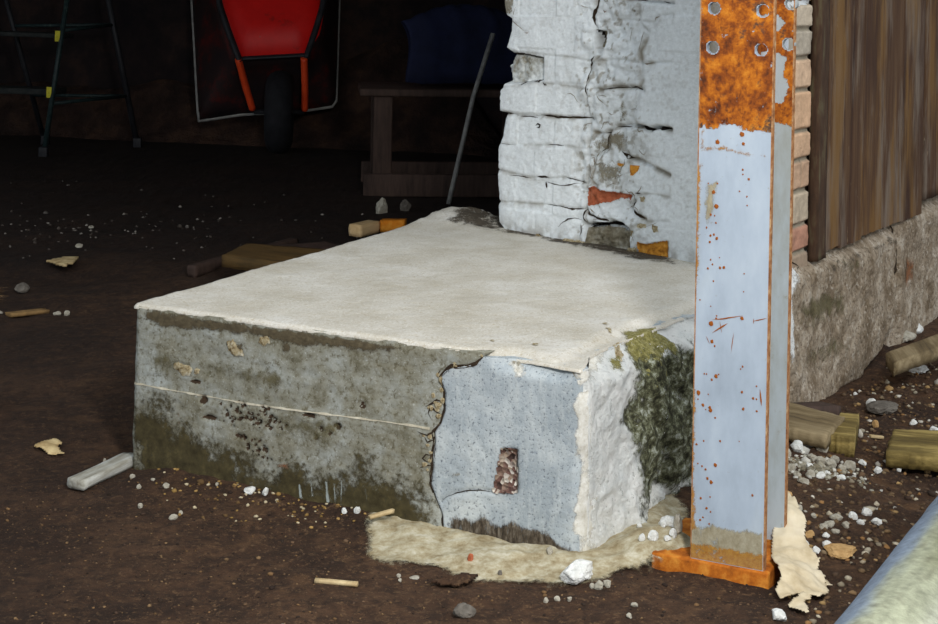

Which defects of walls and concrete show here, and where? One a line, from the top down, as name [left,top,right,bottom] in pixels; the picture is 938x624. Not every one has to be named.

crack [581,0,607,26]
crack [509,57,673,241]
flaking render [588,186,645,206]
rust [690,0,797,572]
damp [242,370,281,386]
damp [133,395,436,523]
crack [417,357,490,527]
damp [451,516,570,551]